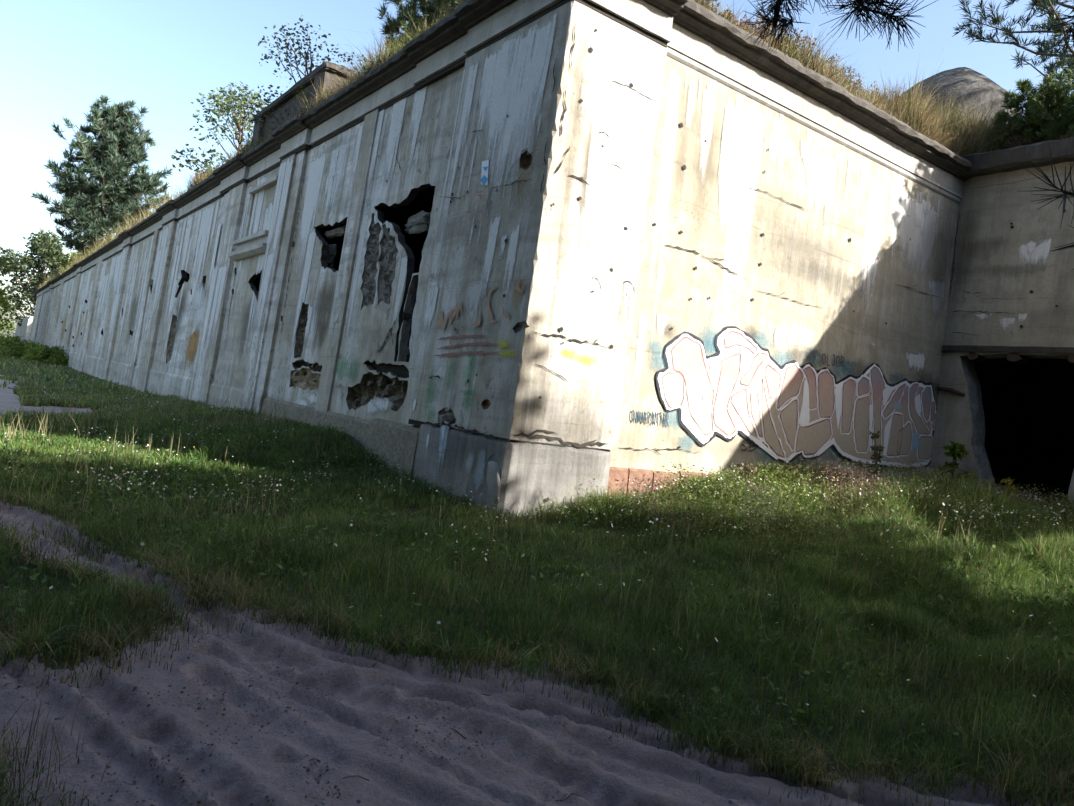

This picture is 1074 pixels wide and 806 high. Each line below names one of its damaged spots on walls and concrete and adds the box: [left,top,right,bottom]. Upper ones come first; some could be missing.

water stain [437,13,557,268]
water stain [569,28,939,371]
rust [186,332,200,366]
spalling [289,303,321,406]
spalling [346,372,408,413]
spalling [360,213,398,311]
spalling [398,274,419,363]
water stain [424,281,439,330]
water stain [467,213,531,319]